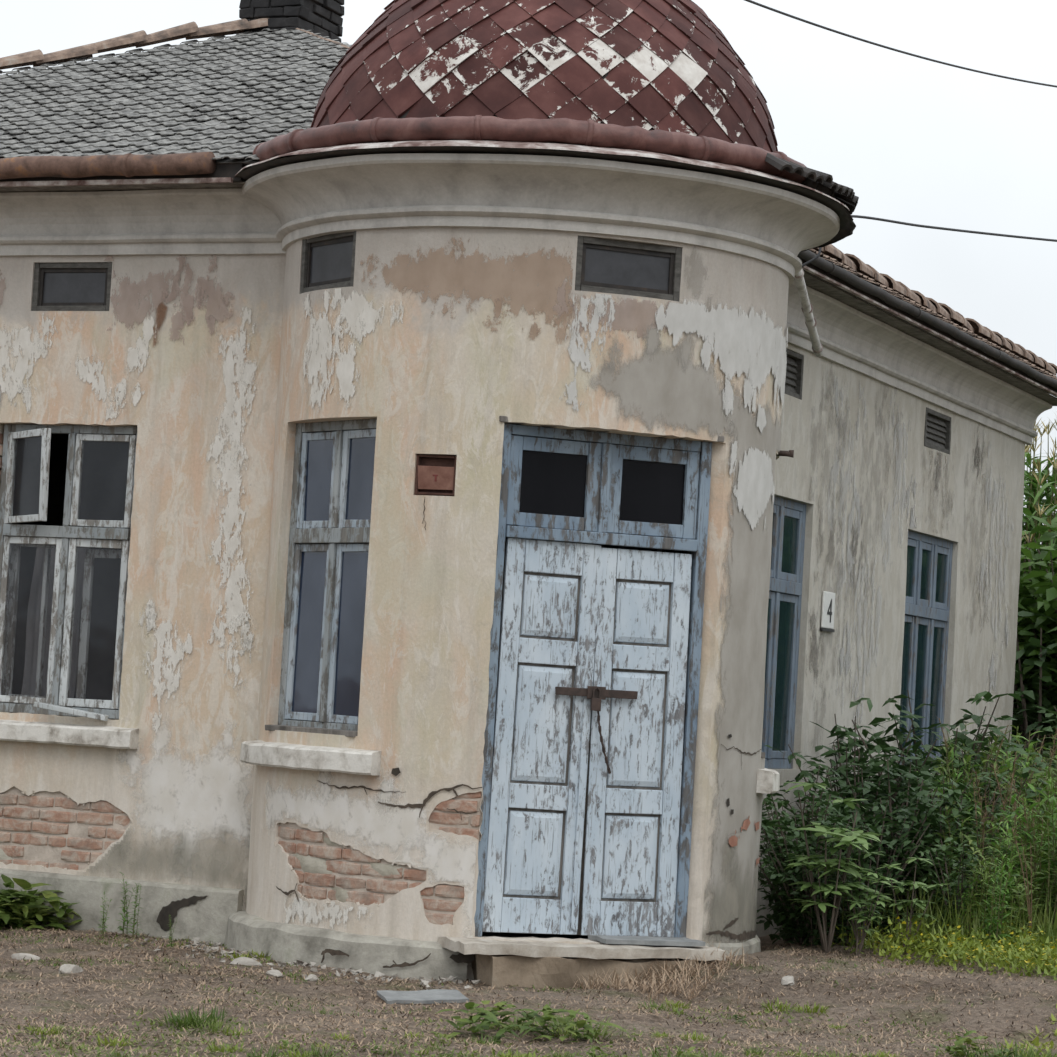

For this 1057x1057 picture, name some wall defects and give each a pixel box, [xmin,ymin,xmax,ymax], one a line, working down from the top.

peeling [0,313,58,413]
peeling [75,255,257,696]
peeling [303,238,788,943]
peeling [138,599,192,734]
flaking render [0,787,132,870]
flaking render [274,822,465,925]
crack [317,780,482,820]